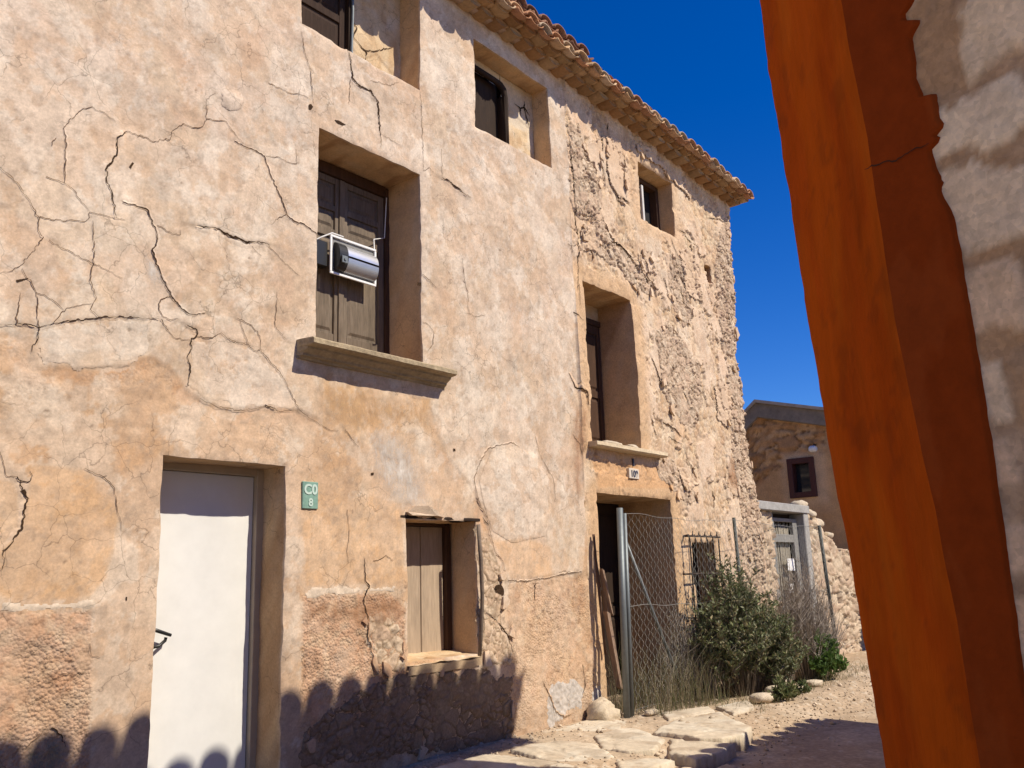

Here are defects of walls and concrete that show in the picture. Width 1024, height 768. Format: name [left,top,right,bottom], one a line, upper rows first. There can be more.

crack [345,23,398,148]
crack [0,94,357,445]
crack [569,372,591,404]
spalling [567,121,773,606]
crack [0,453,33,570]
crack [347,510,391,656]
crack [473,436,582,593]